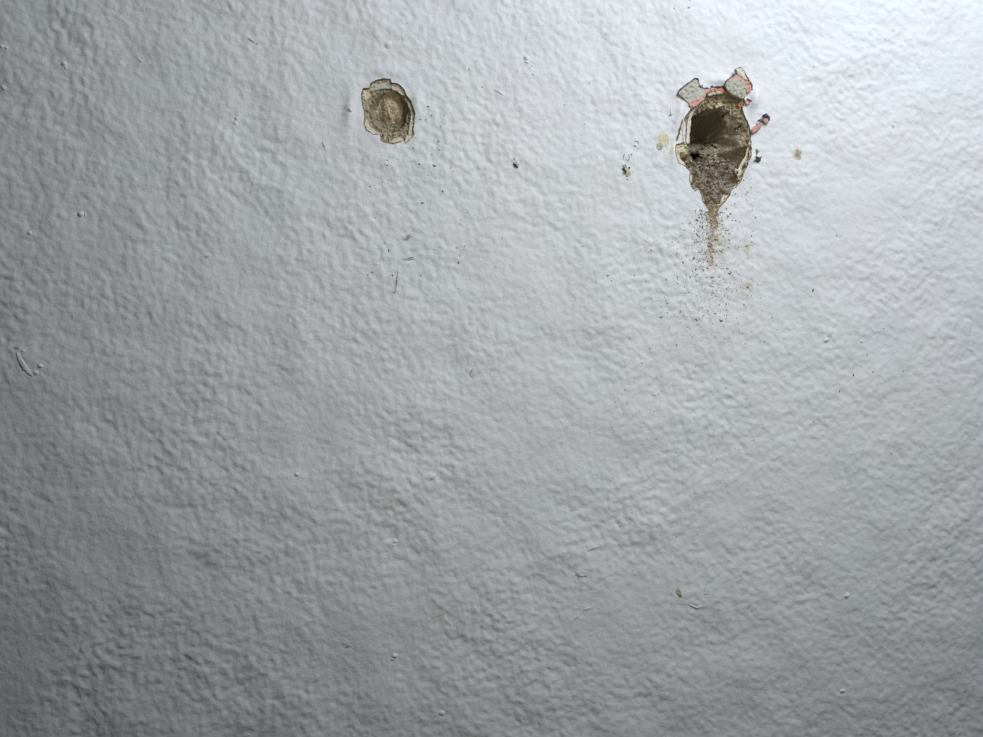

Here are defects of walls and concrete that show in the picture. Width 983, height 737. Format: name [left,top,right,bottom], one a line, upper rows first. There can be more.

spalling [361,78,416,144]
spalling [657,67,770,218]